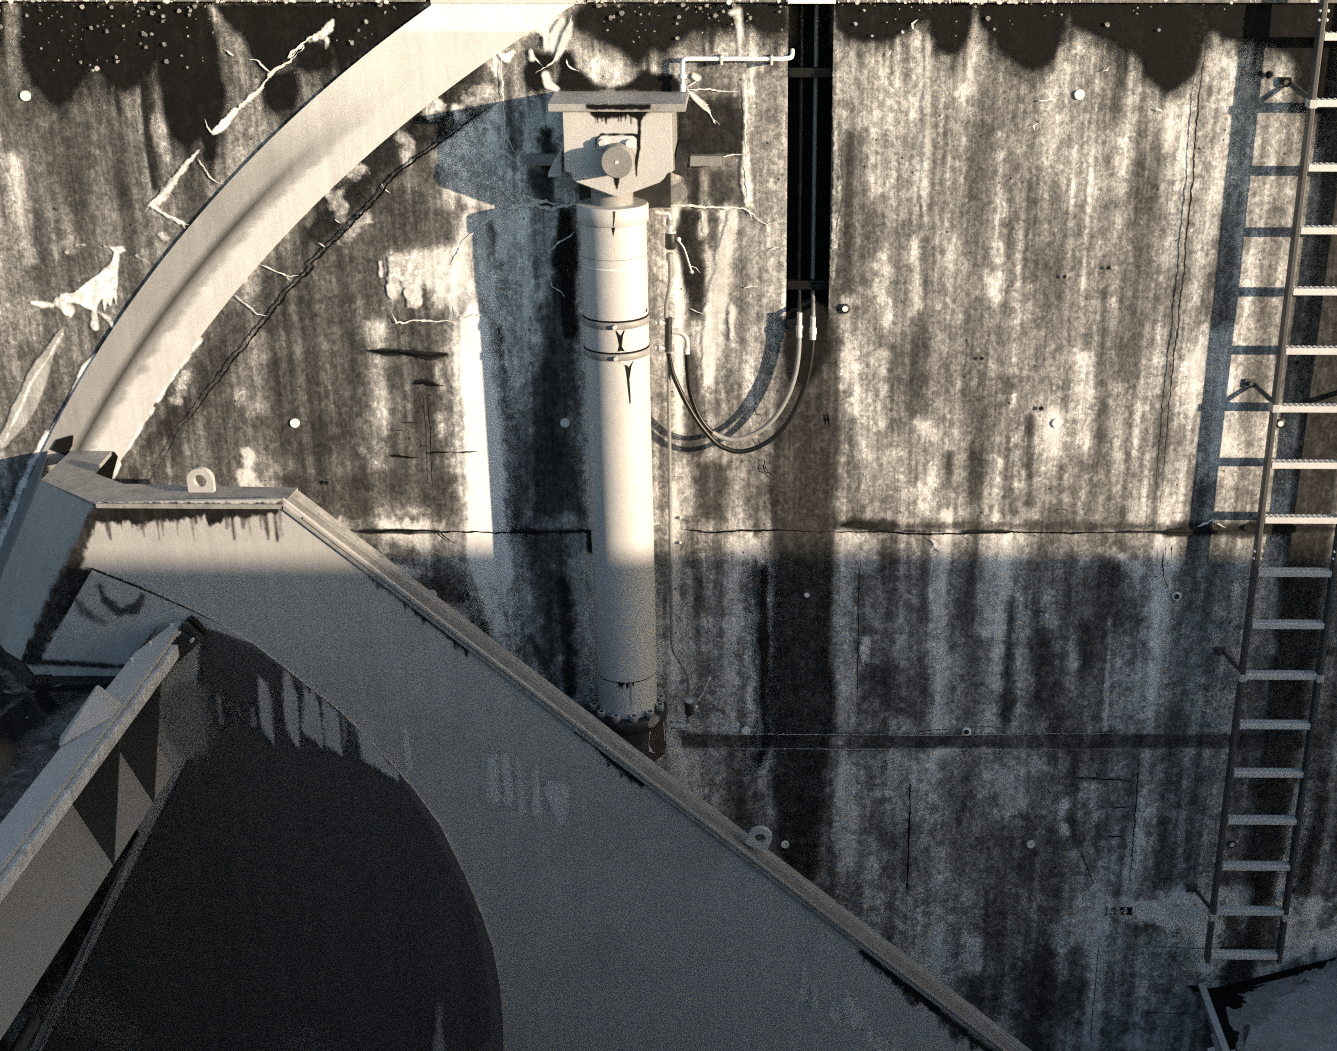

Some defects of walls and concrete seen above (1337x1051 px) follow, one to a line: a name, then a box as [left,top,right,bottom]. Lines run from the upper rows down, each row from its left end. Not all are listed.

damp [0,2,424,190]
damp [0,354,95,550]
spalling [0,246,149,449]
damp [112,337,203,480]
crack [144,16,576,478]
damp [450,243,524,655]
damp [553,213,578,340]
damp [671,183,737,377]
damp [755,303,839,881]
crack [671,38,1335,953]
damp [835,2,1337,991]